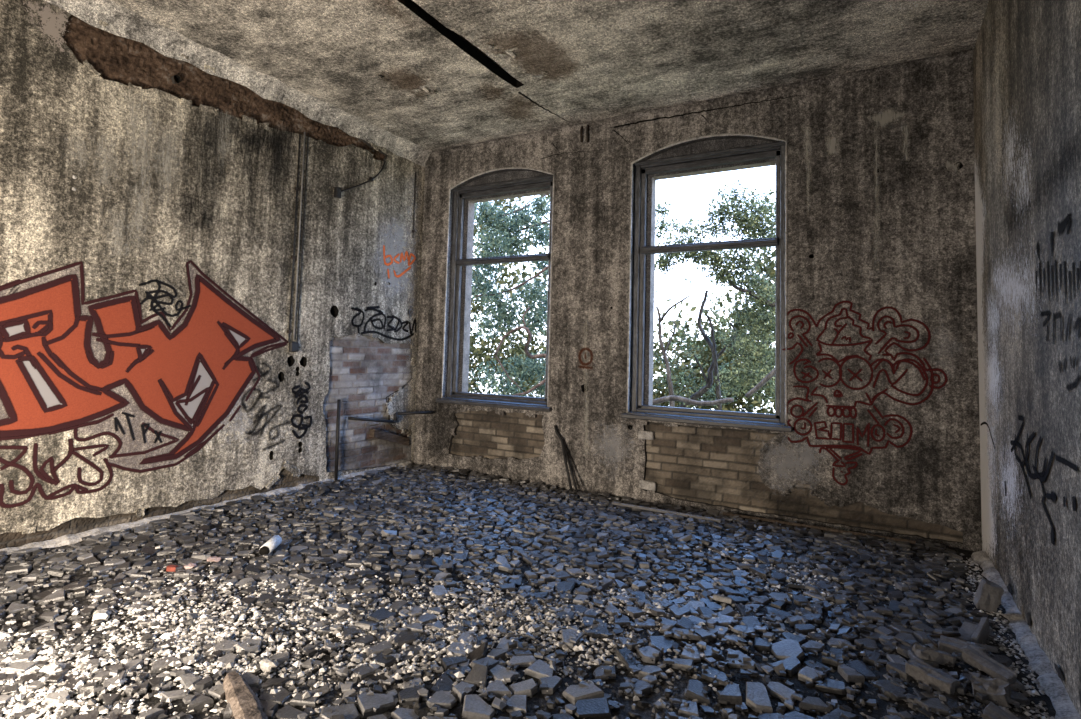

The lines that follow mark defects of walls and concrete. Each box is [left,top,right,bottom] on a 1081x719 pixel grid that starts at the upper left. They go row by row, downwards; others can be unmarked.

flaking render [14,0,385,161]
water stain [185,112,226,223]
water stain [240,129,288,193]
water stain [873,109,908,159]
flaking render [0,333,415,549]